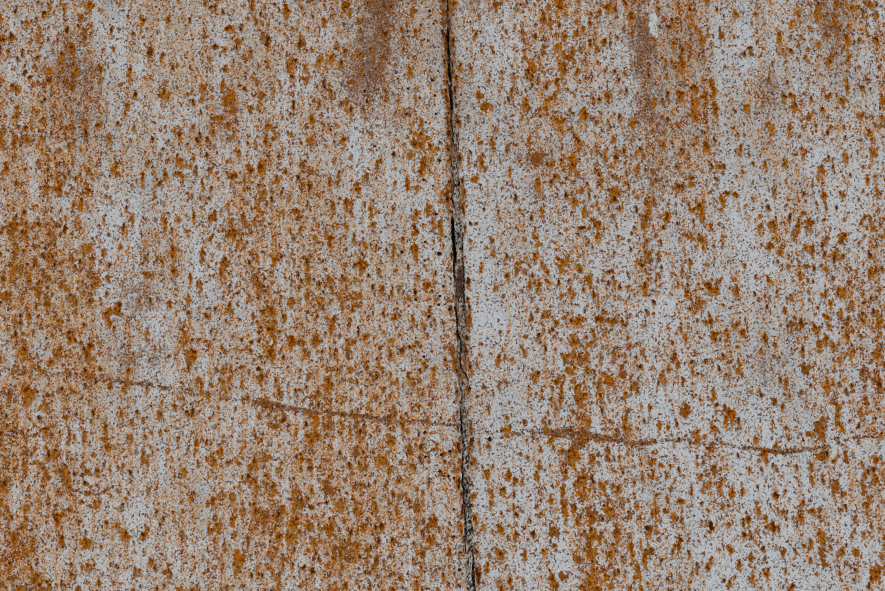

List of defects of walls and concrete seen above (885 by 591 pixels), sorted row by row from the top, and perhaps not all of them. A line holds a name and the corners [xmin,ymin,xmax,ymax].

corrosion [0,0,197,591]
corrosion [104,0,537,591]
crack [445,0,475,591]
corrosion [477,0,885,591]